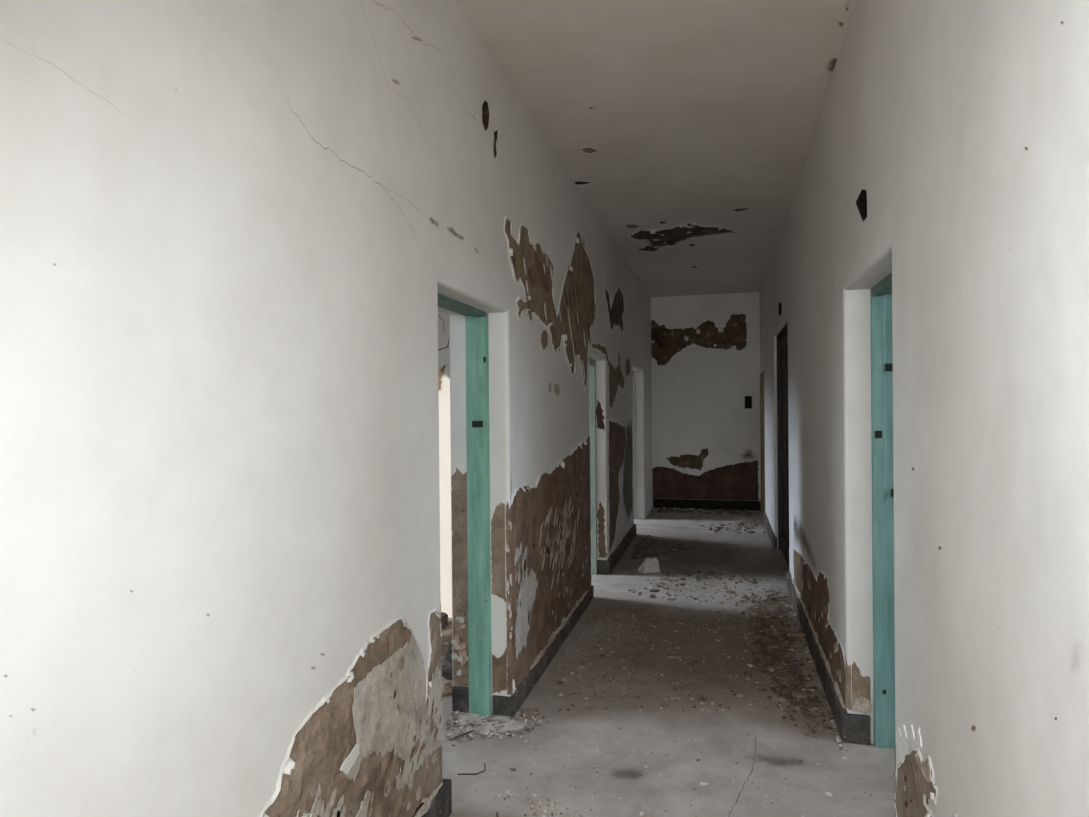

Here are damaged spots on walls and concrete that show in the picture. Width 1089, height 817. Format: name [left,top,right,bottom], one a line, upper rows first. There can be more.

crack [286,98,426,250]
spalling [482,100,498,159]
flaking render [626,221,741,253]
spalling [856,189,867,221]
peeling [651,312,749,366]
peeling [491,214,630,695]
flaking render [652,447,760,501]
peeling [259,468,469,817]
peeling [793,547,872,714]
peeling [894,724,938,817]